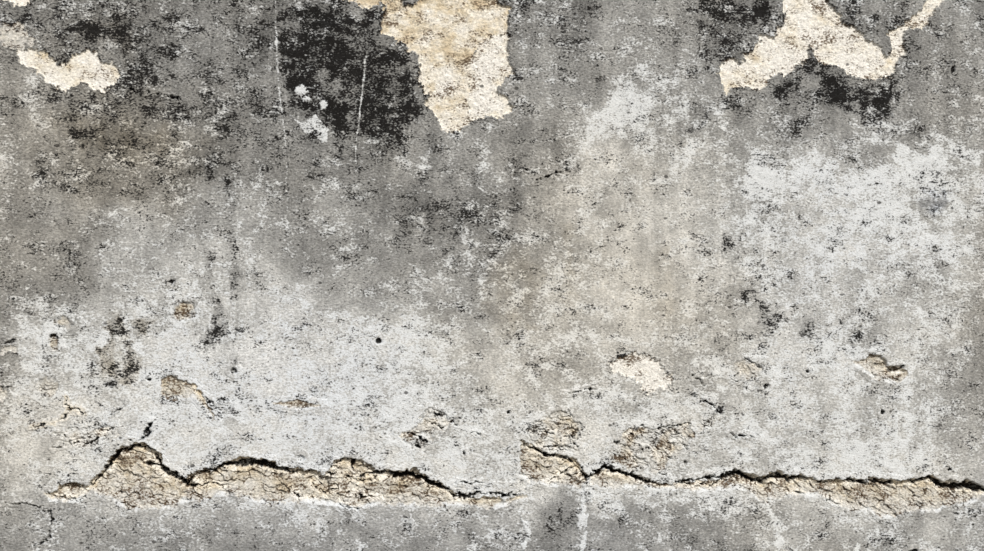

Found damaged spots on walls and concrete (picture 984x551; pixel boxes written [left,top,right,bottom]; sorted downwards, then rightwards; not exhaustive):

peeling [0,0,123,96]
leakage [65,0,150,78]
peeling [338,0,517,136]
leakage [671,0,918,147]
peeling [714,0,947,99]
leakage [23,88,198,185]
leakage [269,0,552,290]
spalling [141,368,224,427]
peeling [605,347,677,398]
spalling [846,348,914,390]
crack [0,353,984,550]
spalling [36,402,984,537]